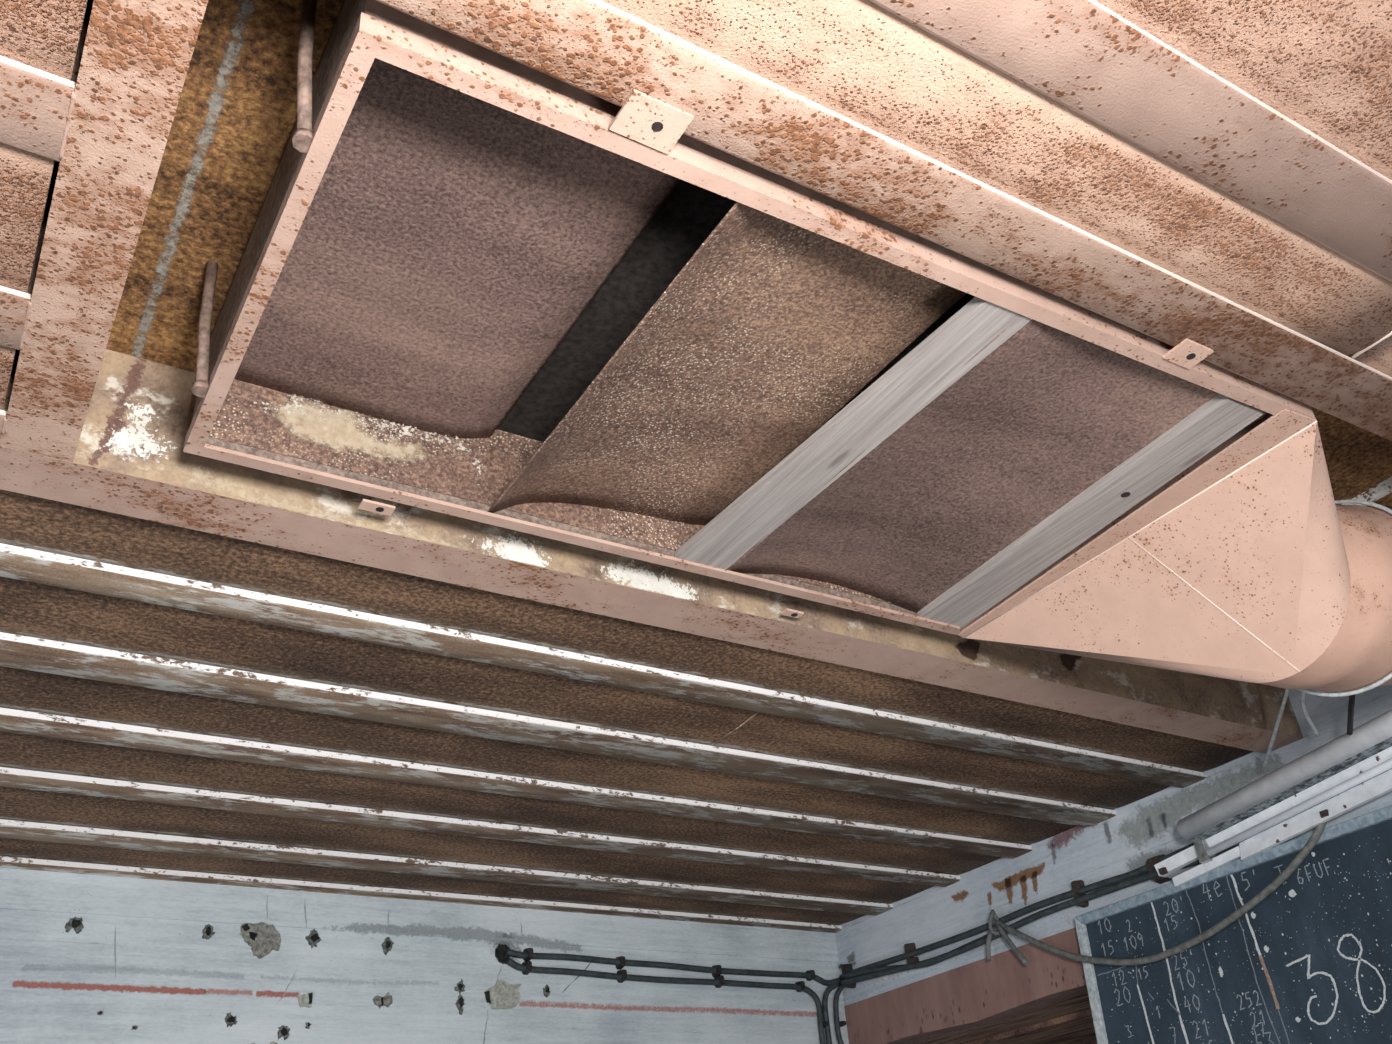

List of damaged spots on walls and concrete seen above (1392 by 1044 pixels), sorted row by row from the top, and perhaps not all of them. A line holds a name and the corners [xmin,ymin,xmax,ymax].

peeling [472,531,556,569]
rust [988,863,1045,905]
spalling [240,922,281,959]